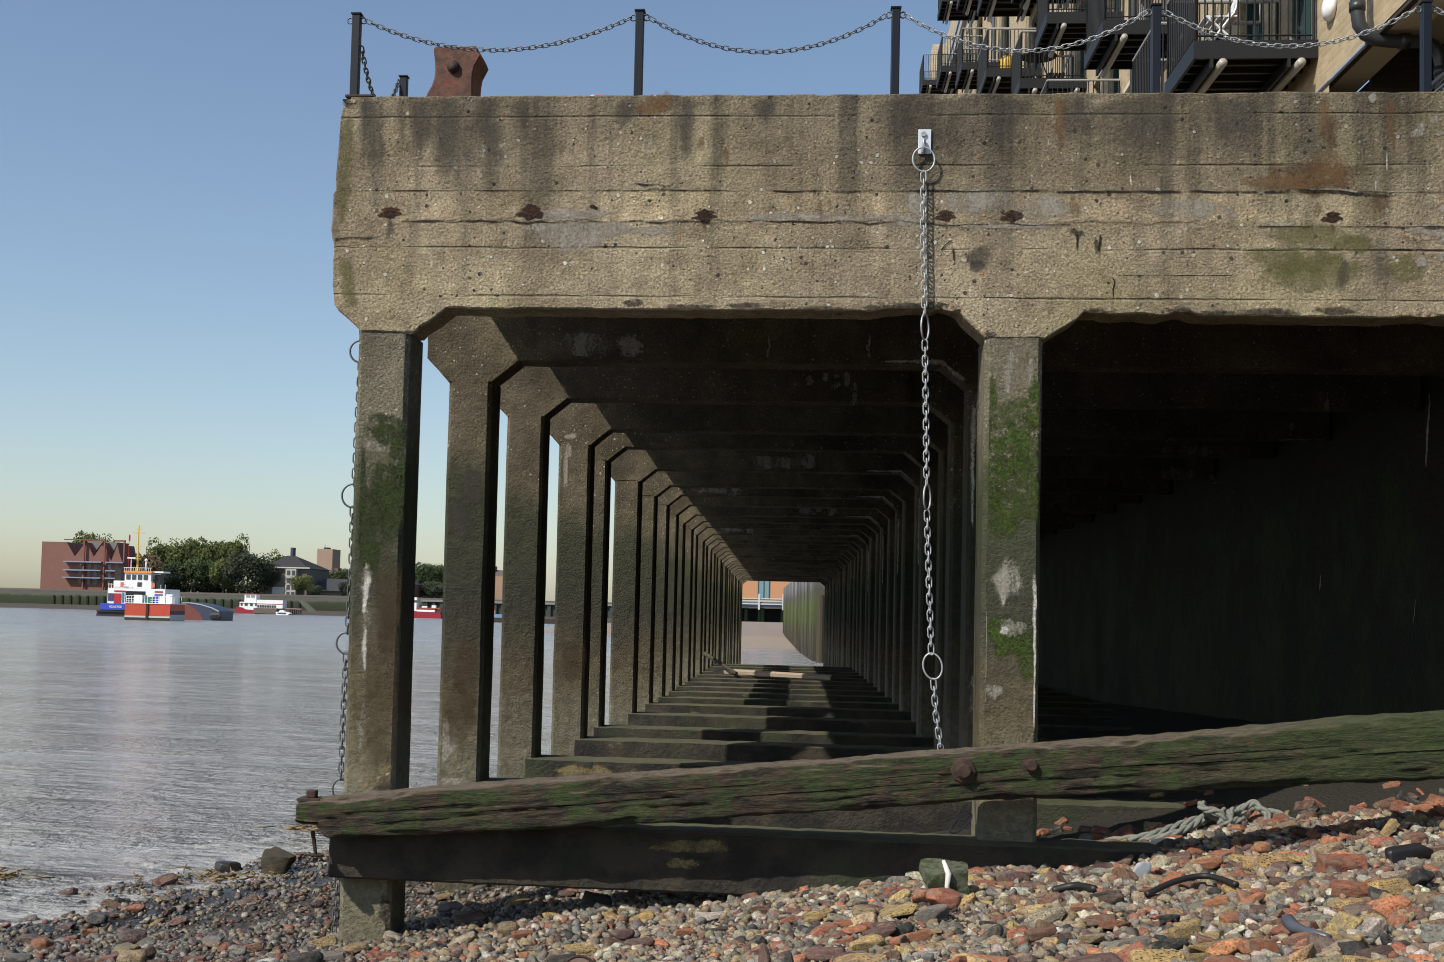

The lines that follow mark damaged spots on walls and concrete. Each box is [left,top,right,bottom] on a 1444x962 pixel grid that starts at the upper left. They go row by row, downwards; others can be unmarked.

corrosion [378,207,402,217]
corrosion [515,206,543,219]
corrosion [934,210,956,227]
corrosion [1000,210,1024,229]
corrosion [1322,211,1343,227]
damp [985,561,1037,741]